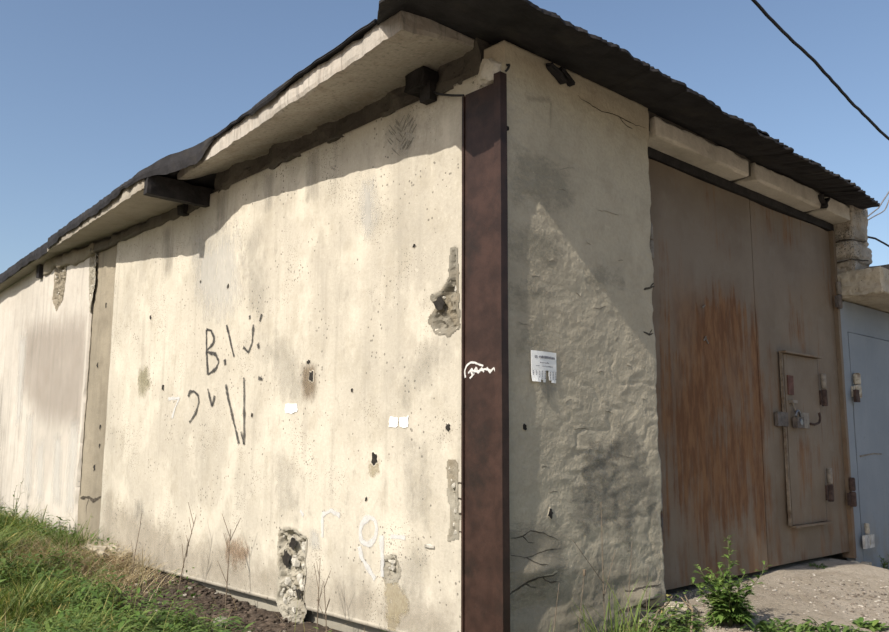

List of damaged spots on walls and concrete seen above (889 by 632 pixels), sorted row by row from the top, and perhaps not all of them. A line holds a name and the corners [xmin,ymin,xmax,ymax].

crack [578,93,647,129]
spalling [52,266,67,311]
spalling [428,247,460,337]
corrosion [303,367,315,396]
spalling [276,527,307,624]
crack [510,527,561,595]